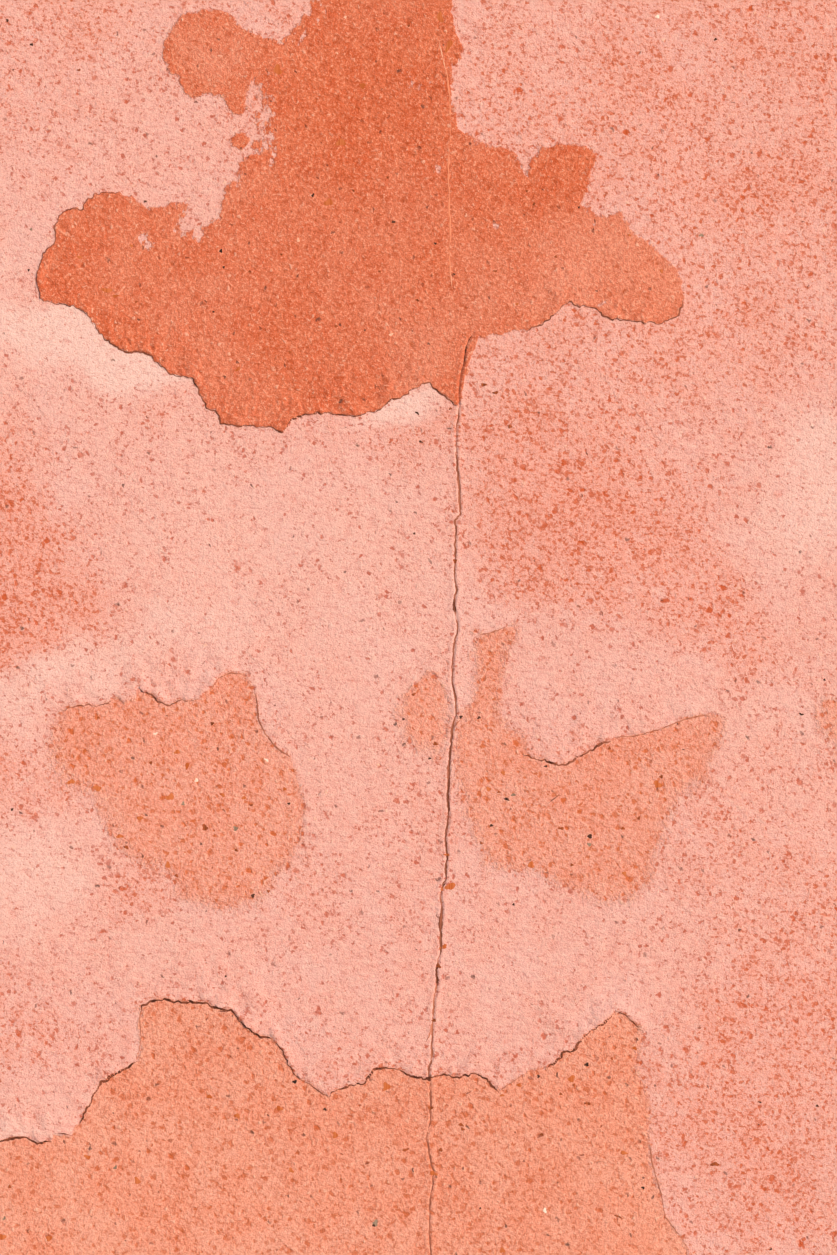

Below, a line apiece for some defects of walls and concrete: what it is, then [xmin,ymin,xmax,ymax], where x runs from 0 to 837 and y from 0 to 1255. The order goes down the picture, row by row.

peeling [17,0,704,452]
peeling [31,653,324,926]
crack [0,334,641,1255]
peeling [381,603,744,921]
peeling [0,975,707,1255]